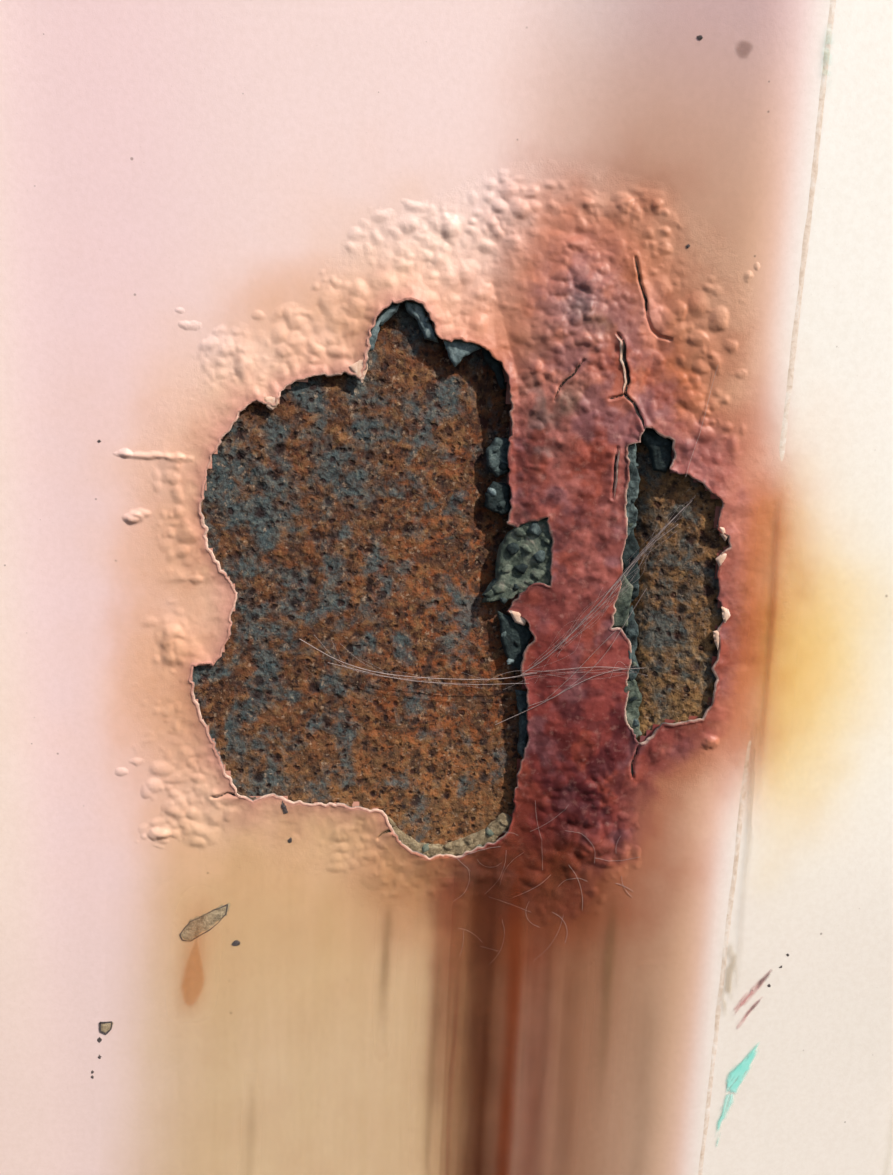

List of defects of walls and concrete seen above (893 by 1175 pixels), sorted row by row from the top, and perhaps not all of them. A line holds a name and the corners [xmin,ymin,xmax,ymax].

crack [609,334,644,427]
crack [635,261,648,315]
peeling [189,297,555,860]
peeling [609,425,733,746]